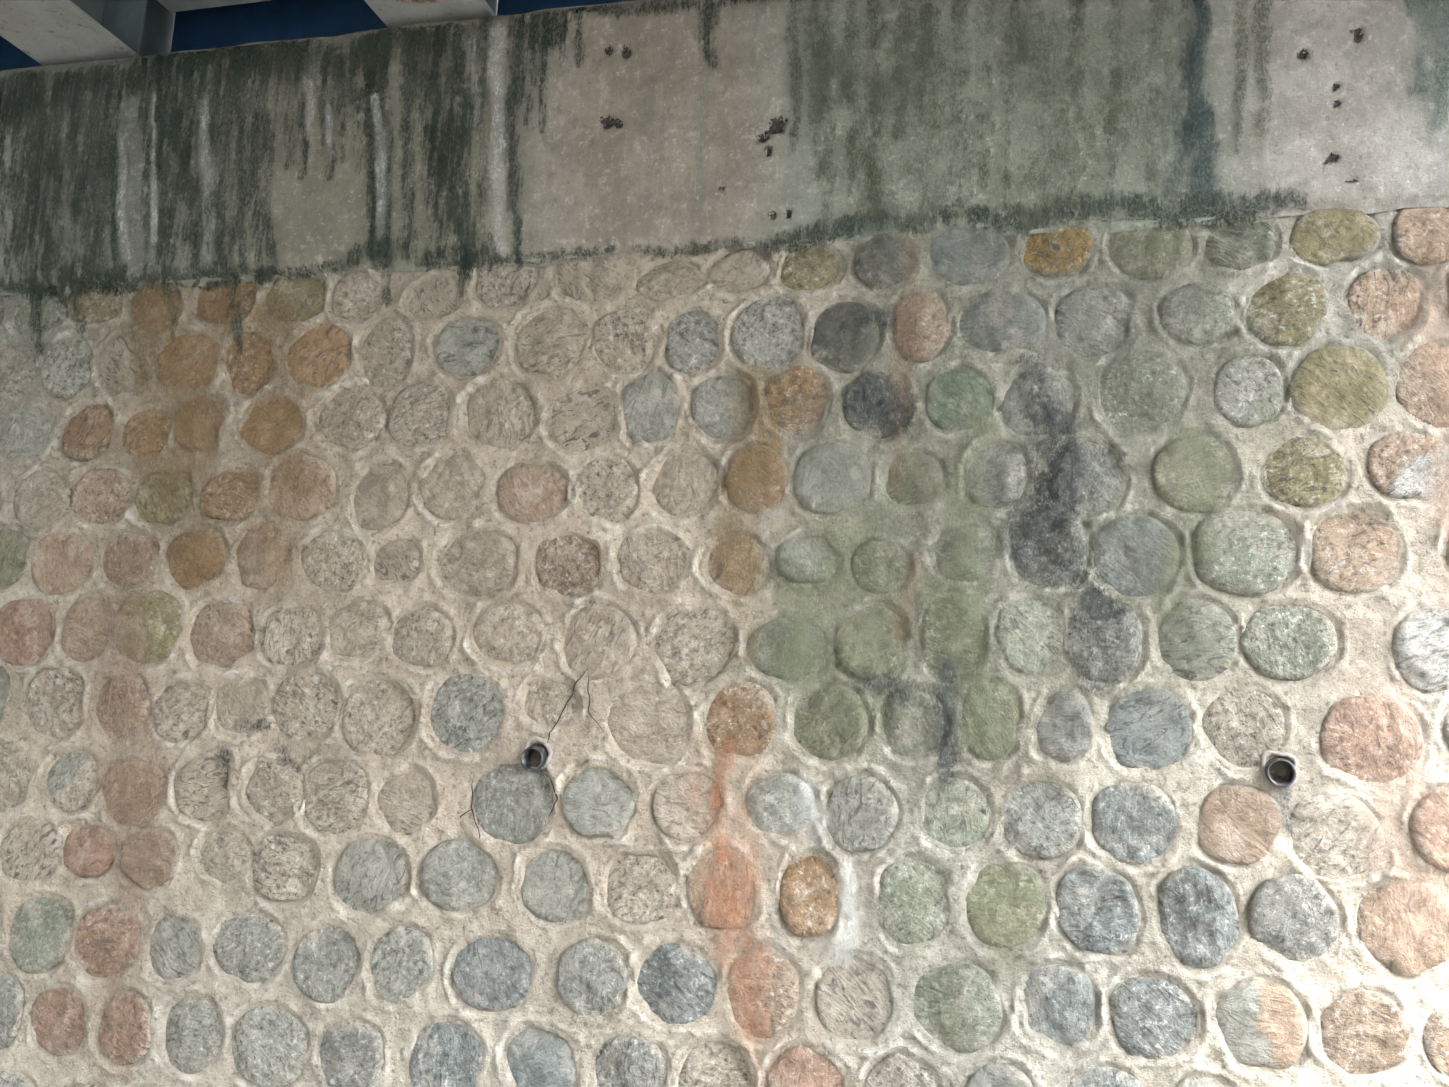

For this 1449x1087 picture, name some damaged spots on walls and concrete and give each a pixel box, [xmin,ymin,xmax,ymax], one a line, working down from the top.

damp [0,9,584,355]
damp [785,0,802,151]
damp [815,0,884,220]
damp [1180,0,1222,205]
damp [1233,0,1273,153]
damp [1003,346,1129,699]
damp [935,658,959,783]